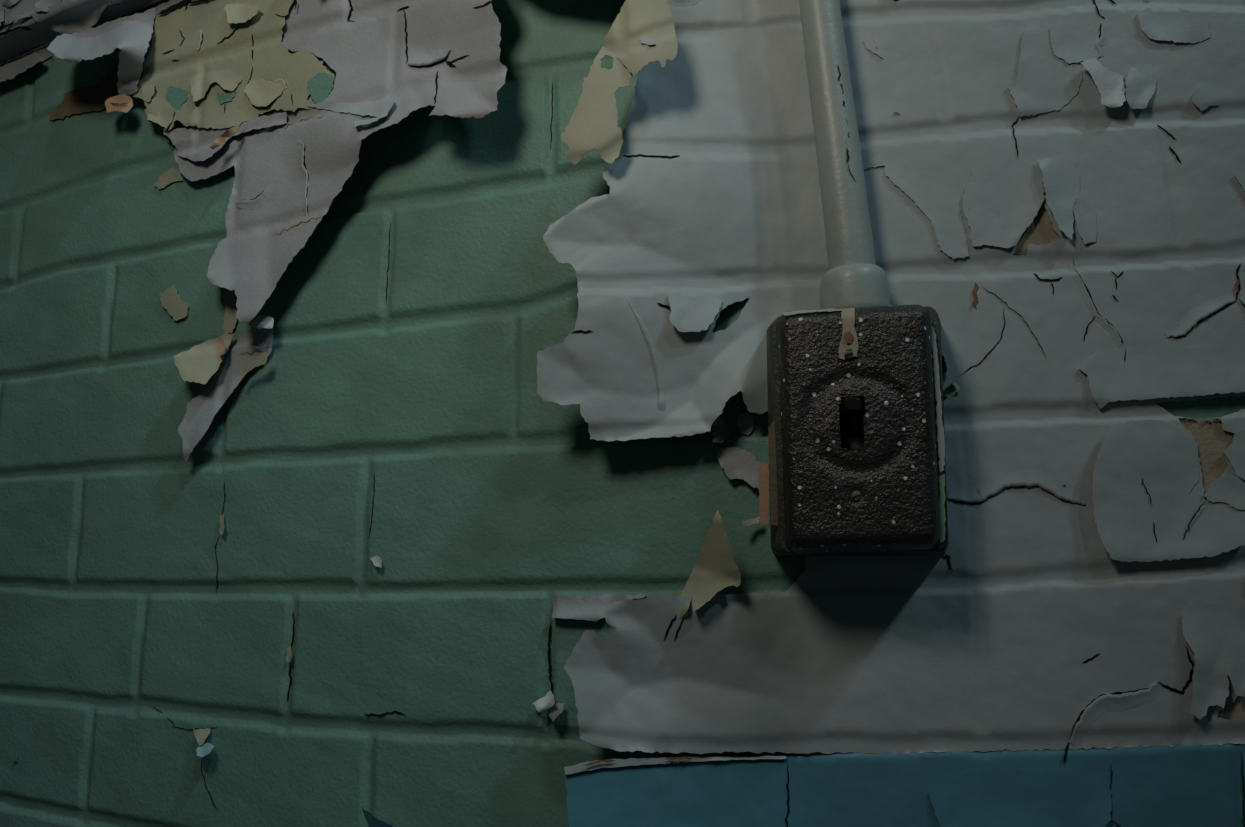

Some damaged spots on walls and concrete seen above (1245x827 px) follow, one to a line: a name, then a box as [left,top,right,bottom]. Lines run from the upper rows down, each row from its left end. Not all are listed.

crack [838,66,855,180]
crack [1011,116,1019,156]
crack [1157,124,1181,163]
peeling [0,0,508,461]
crack [962,287,1045,374]
crack [1033,258,1126,365]
crack [1164,263,1245,338]
peeling [532,0,1245,827]
crack [948,469,1086,505]
crack [1141,478,1205,543]
crack [1063,646,1194,764]
peeling [362,808,393,827]